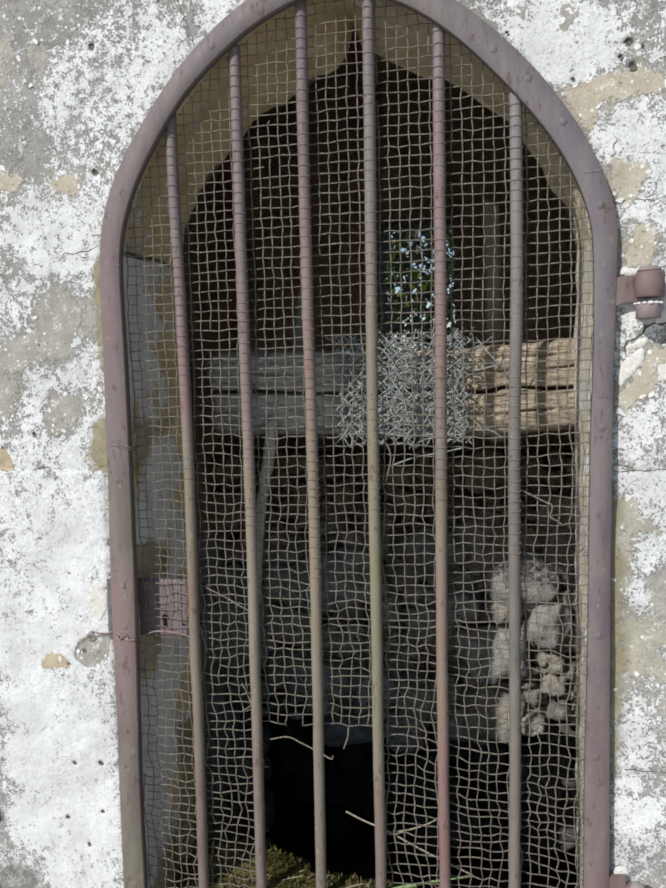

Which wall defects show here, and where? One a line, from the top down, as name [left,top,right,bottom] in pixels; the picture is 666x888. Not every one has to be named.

peeling [556,3,579,31]
peeling [560,28,666,130]
peeling [0,114,43,192]
peeling [48,174,82,197]
peeling [608,157,653,209]
crack [621,322,666,356]
spalling [0,445,14,471]
peeling [611,494,666,691]
spalling [41,635,110,671]